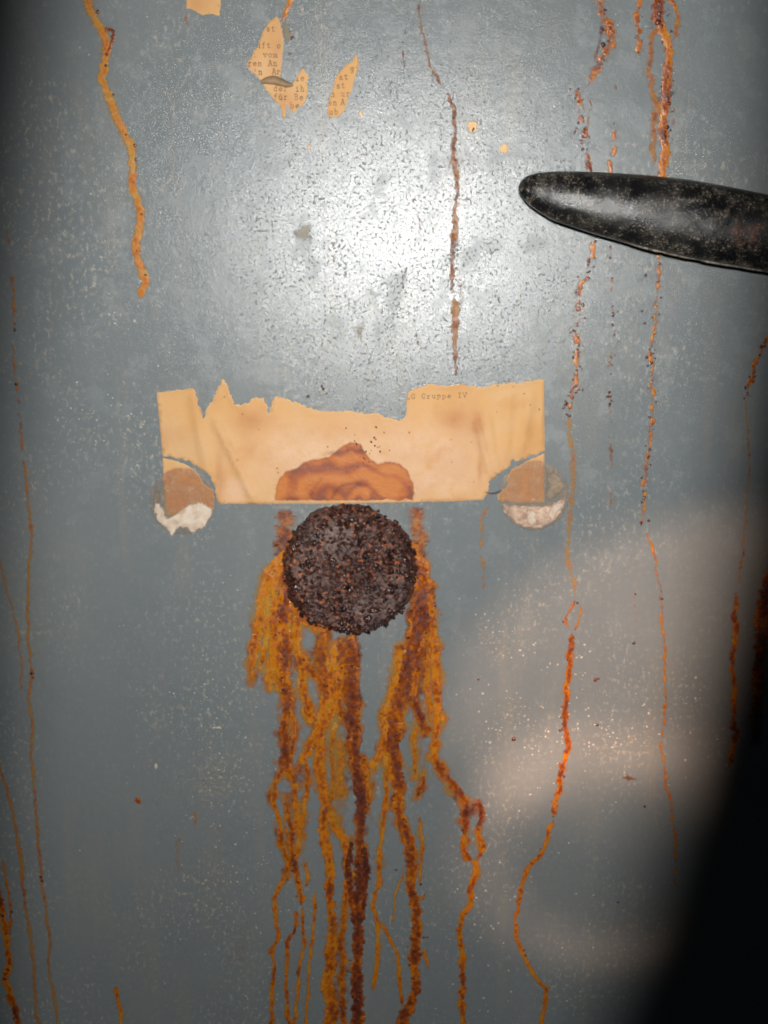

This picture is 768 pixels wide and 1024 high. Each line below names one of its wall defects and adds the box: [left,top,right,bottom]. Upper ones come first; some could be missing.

rust [83,0,150,298]
rust [448,94,460,373]
rust [562,235,597,567]
rust [569,0,617,173]
rust [640,252,662,574]
rust [633,0,680,177]
rust [743,336,768,399]
rust [0,463,59,1024]
rust [244,427,486,1024]
rust [514,601,582,1024]
rust [659,591,678,883]
rust [728,571,768,765]